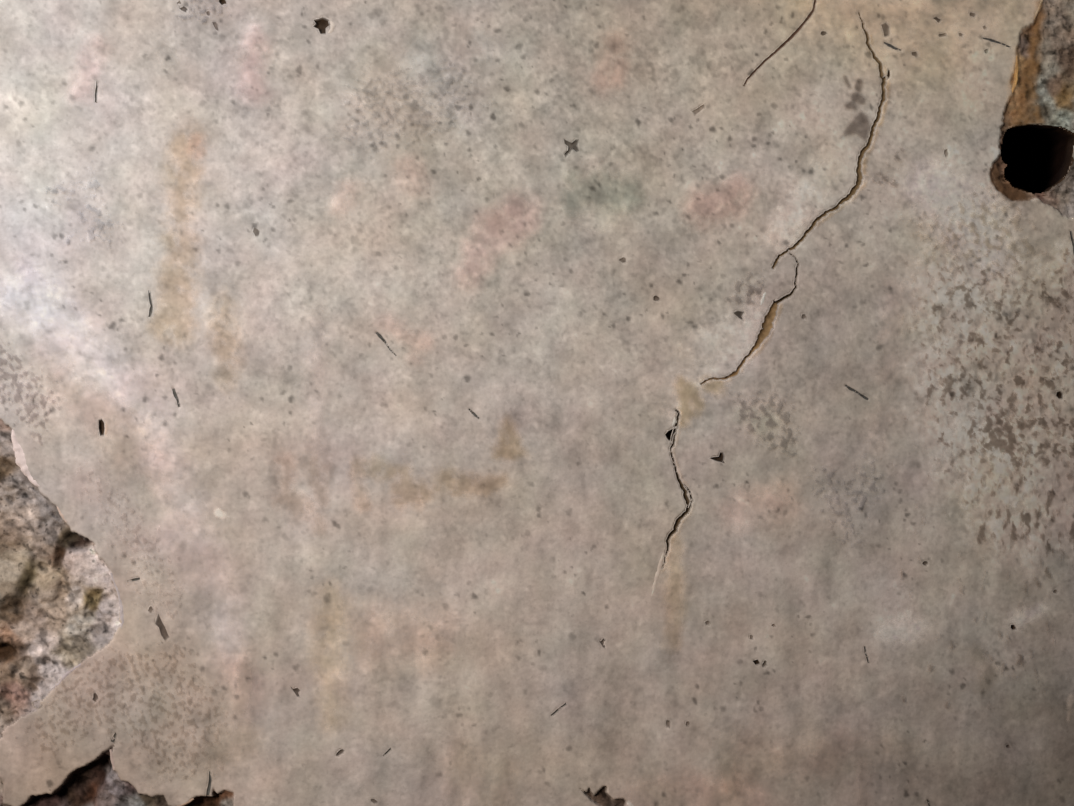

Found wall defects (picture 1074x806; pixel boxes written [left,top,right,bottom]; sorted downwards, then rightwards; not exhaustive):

crack [701,0,890,386]
spalling [932,16,964,38]
spalling [989,0,1074,219]
peeling [915,249,1074,552]
spalling [0,417,124,739]
spalling [147,605,170,642]
crack [651,409,693,597]
spalling [0,744,234,806]
spalling [580,786,633,806]